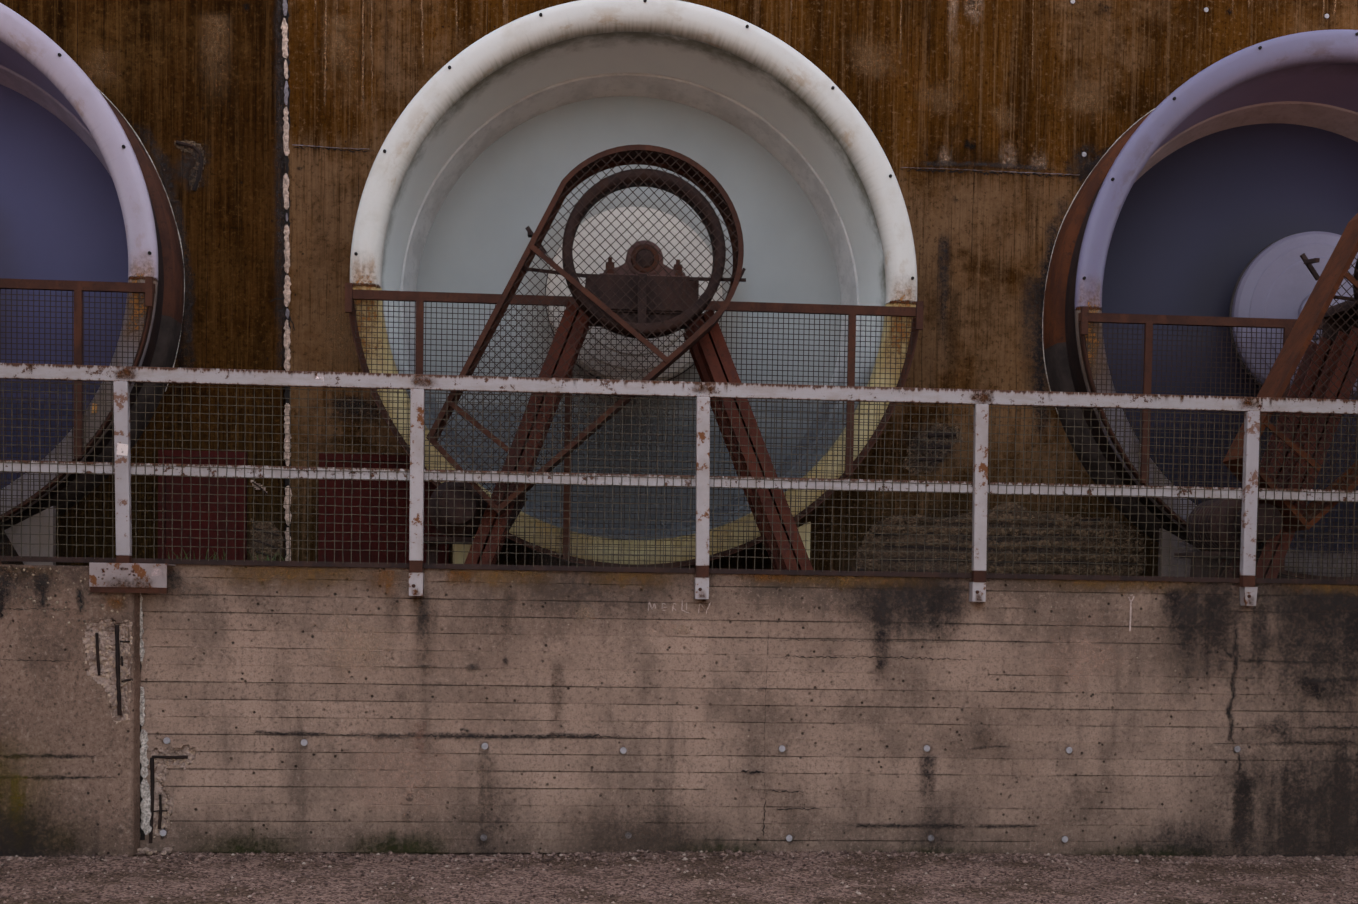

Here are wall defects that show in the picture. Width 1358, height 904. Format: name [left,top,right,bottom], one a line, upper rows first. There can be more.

corrosion [353,268,381,358]
corrosion [887,289,916,358]
spalling [0,566,145,724]
damp [859,554,962,668]
crack [1226,626,1358,771]
damp [1253,567,1358,697]
spalling [149,743,200,843]
damp [1233,740,1358,857]